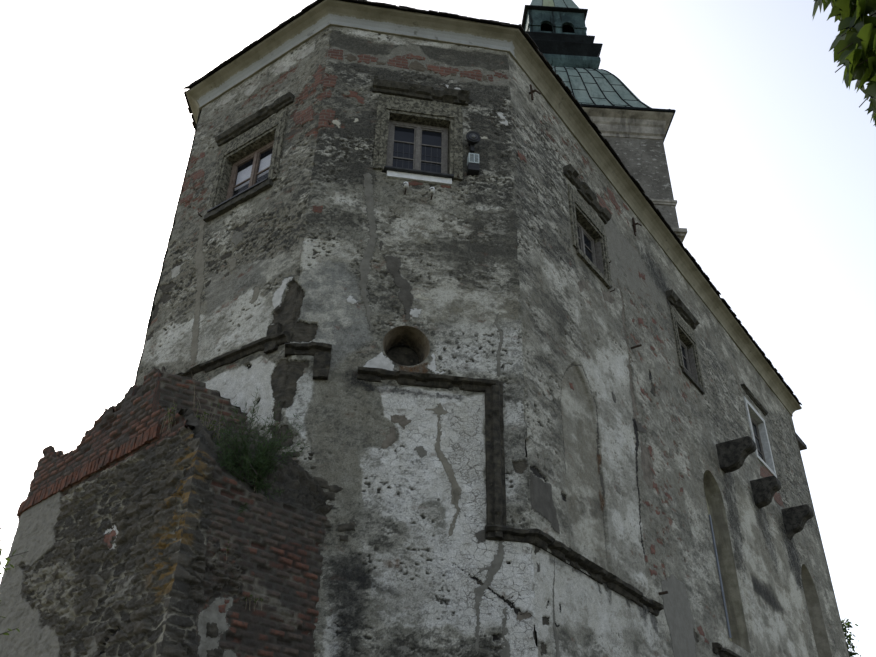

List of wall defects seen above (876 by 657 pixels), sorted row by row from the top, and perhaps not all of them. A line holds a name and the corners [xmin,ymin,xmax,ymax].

spalling [269,277,318,343]
spalling [268,359,309,447]
crack [425,403,462,537]
peeling [103,525,118,553]
peeling [197,596,238,657]
crack [452,541,532,657]
crack [552,558,560,657]